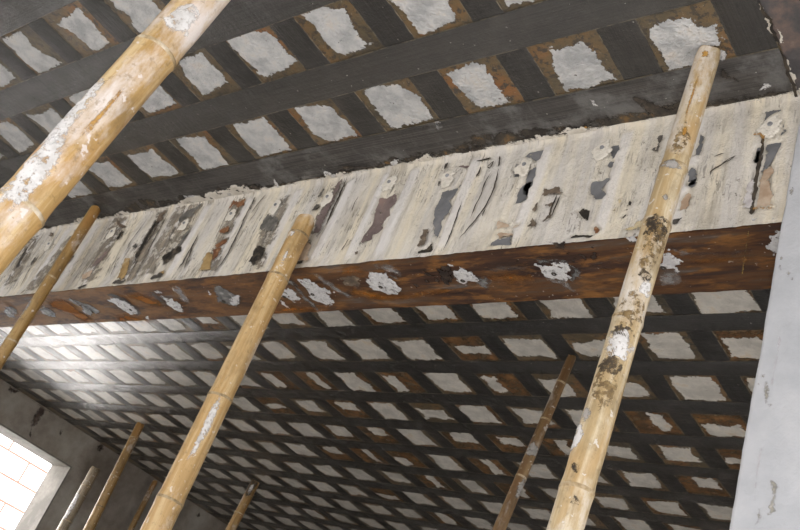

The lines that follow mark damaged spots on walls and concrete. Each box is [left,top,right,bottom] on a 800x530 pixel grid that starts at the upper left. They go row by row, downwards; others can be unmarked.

flaking render [78,217,127,289]
flaking render [113,203,202,284]
flaking render [199,197,255,271]
flaking render [249,196,288,269]
flaking render [297,179,342,264]
flaking render [355,194,397,254]
flaking render [417,181,461,254]
flaking render [491,187,563,246]
flaking render [513,150,544,204]
flaking render [590,178,610,199]
flaking render [672,168,698,224]
flaking render [743,124,786,210]